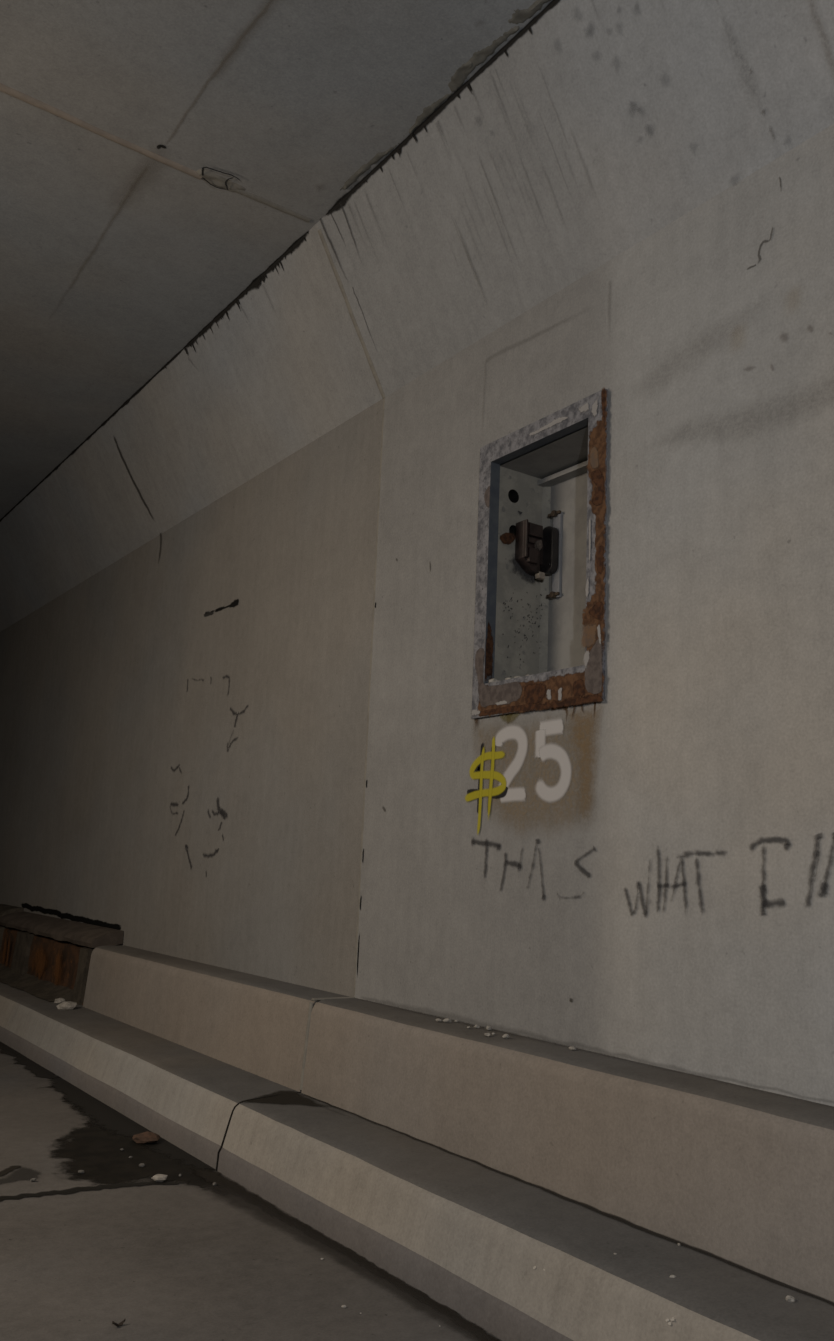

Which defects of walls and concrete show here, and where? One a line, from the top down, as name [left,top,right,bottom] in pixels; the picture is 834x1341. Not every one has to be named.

damp [0,0,560,522]
crack [748,228,773,269]
damp [0,1166,39,1184]
damp [49,1077,220,1193]